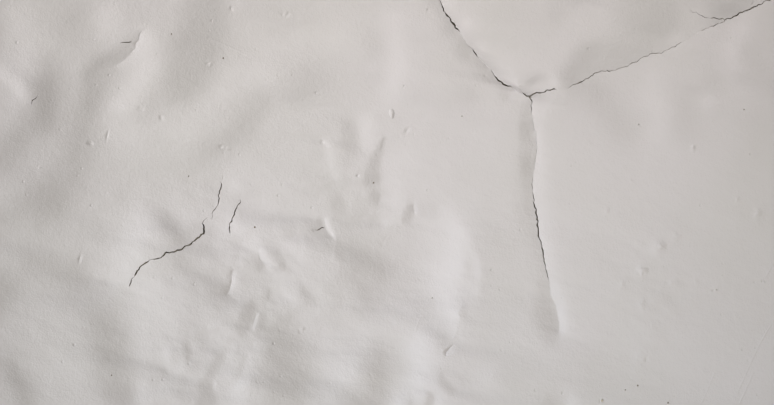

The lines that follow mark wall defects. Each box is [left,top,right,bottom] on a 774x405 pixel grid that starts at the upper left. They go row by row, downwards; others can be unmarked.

crack [117,38,133,47]
crack [436,0,774,288]
crack [126,175,244,288]